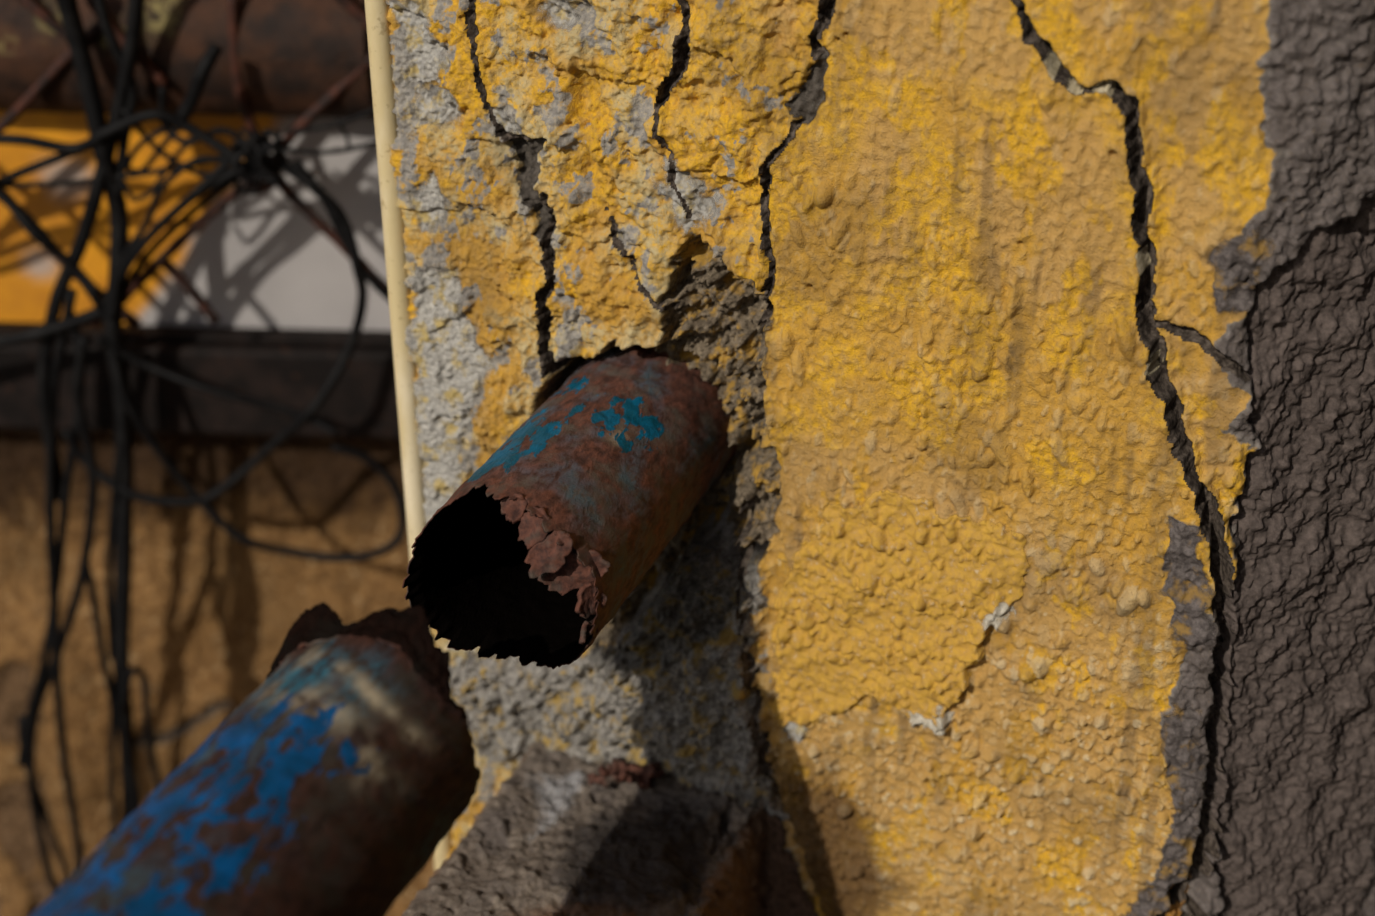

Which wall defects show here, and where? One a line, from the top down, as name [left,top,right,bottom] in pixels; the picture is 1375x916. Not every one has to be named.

crack [463,0,542,143]
crack [652,0,692,219]
crack [808,0,836,60]
crack [534,192,576,379]
crack [605,207,681,312]
crack [758,118,804,330]
peeling [408,268,494,523]
flaking render [448,148,1030,822]
crack [1010,0,1251,916]
spalling [1125,194,1375,916]